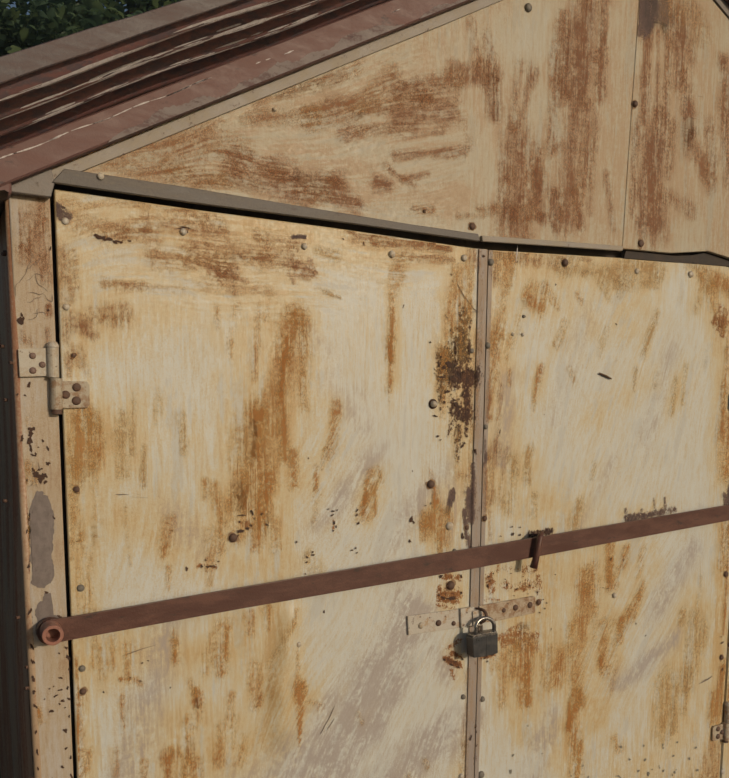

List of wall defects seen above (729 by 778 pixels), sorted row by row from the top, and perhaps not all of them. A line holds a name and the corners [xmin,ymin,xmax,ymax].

peeling [0,0,405,159]
rust [255,49,499,141]
rust [460,0,608,239]
rust [631,0,712,250]
rust [147,209,314,289]
peeling [27,427,49,456]
peeling [26,462,62,635]
rust [202,308,308,548]
rust [410,479,456,550]
rust [436,573,463,609]
rust [443,639,464,680]
rust [430,276,512,462]